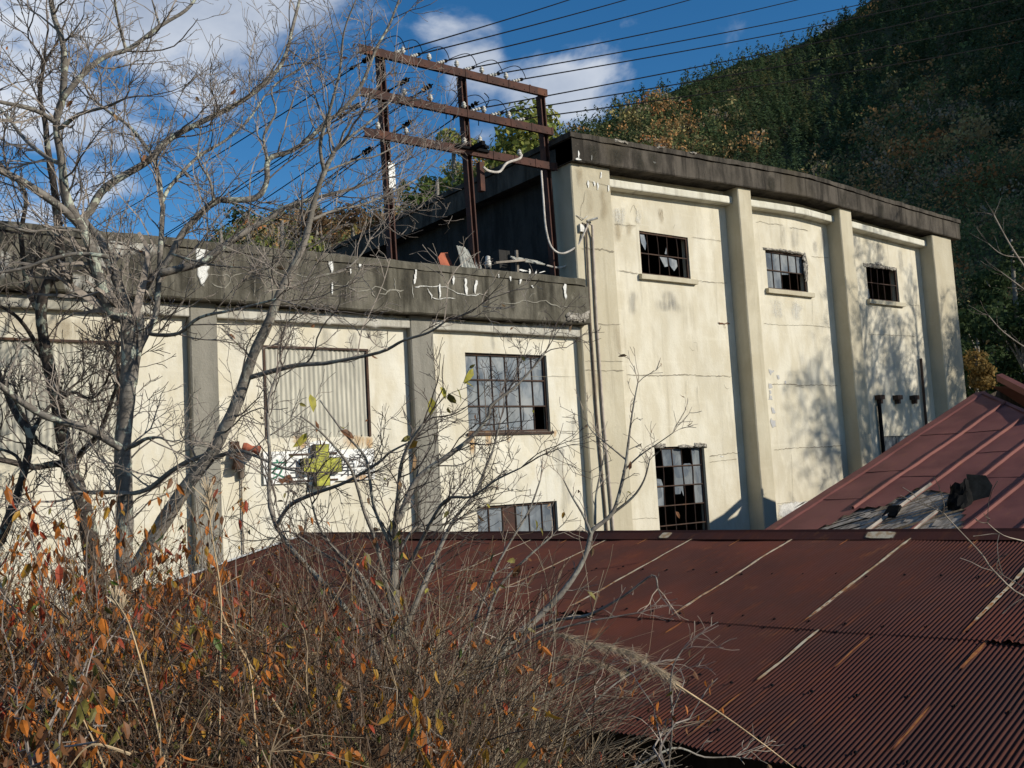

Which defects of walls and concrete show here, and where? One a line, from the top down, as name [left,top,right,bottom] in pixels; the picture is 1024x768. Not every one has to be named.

damp [177,248,209,286]
rust [438,252,453,266]